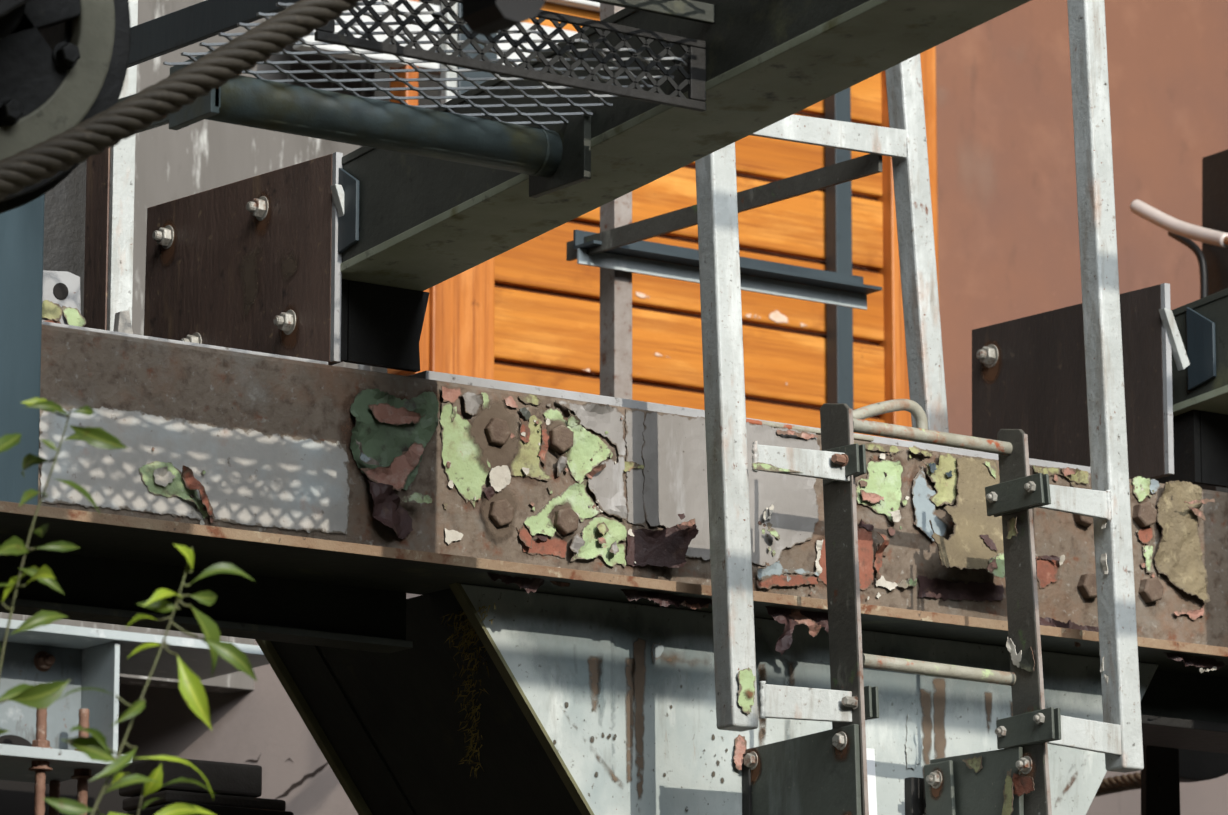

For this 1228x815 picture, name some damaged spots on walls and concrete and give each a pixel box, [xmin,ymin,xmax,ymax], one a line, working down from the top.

peeling [39,386,710,594]
peeling [746,422,827,595]
peeling [854,442,958,600]
peeling [1032,465,1089,487]
peeling [1132,476,1160,503]
peeling [1137,527,1160,578]
peeling [765,606,829,656]
peeling [1006,638,1035,672]
peeling [1039,617,1099,647]